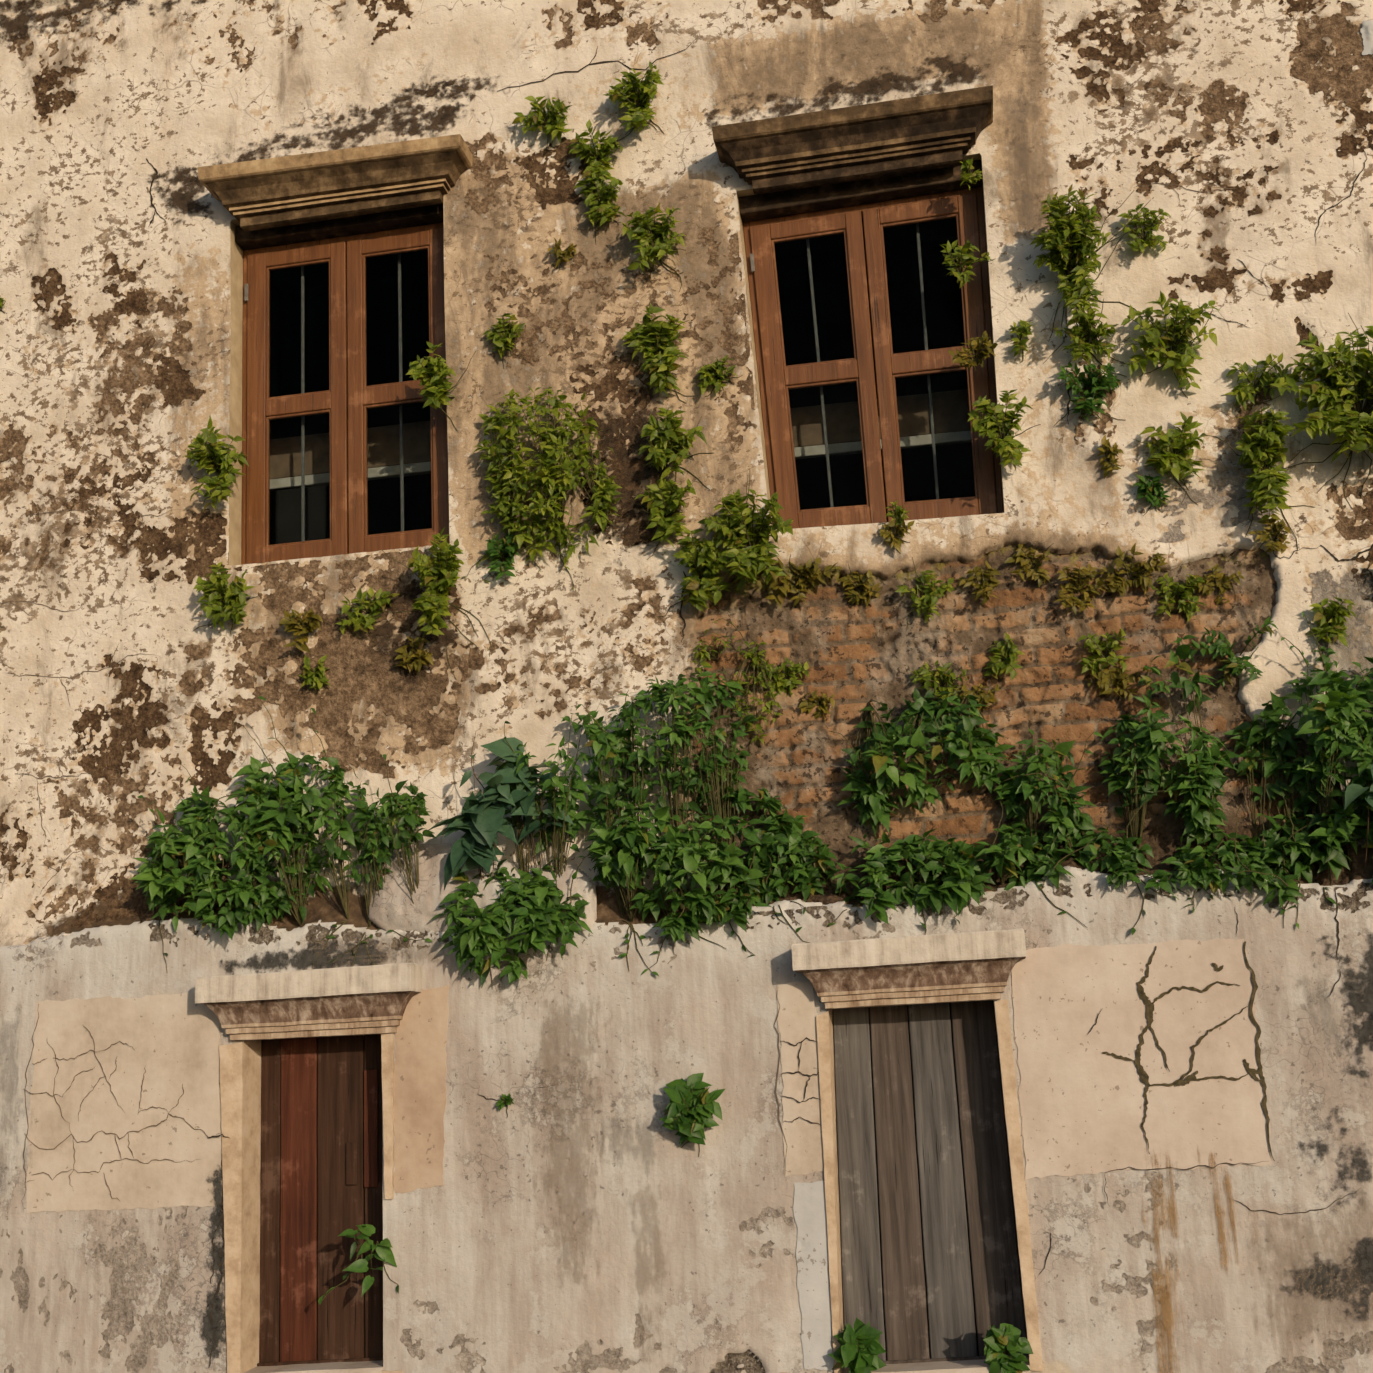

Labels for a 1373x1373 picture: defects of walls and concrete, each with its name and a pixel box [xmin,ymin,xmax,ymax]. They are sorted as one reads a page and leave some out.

peeling [1279,0,1373,157]
peeling [1066,79,1282,302]
peeling [0,251,612,950]
flaking render [580,542,1373,940]
crack [774,990,820,1166]
crack [1088,911,1275,1205]
mould [1314,934,1373,1077]
crack [22,1004,229,1367]
water stain [201,1170,227,1359]
corrosion [1154,1267,1173,1373]
corrosion [1214,1177,1236,1268]
mould [1281,1238,1373,1320]